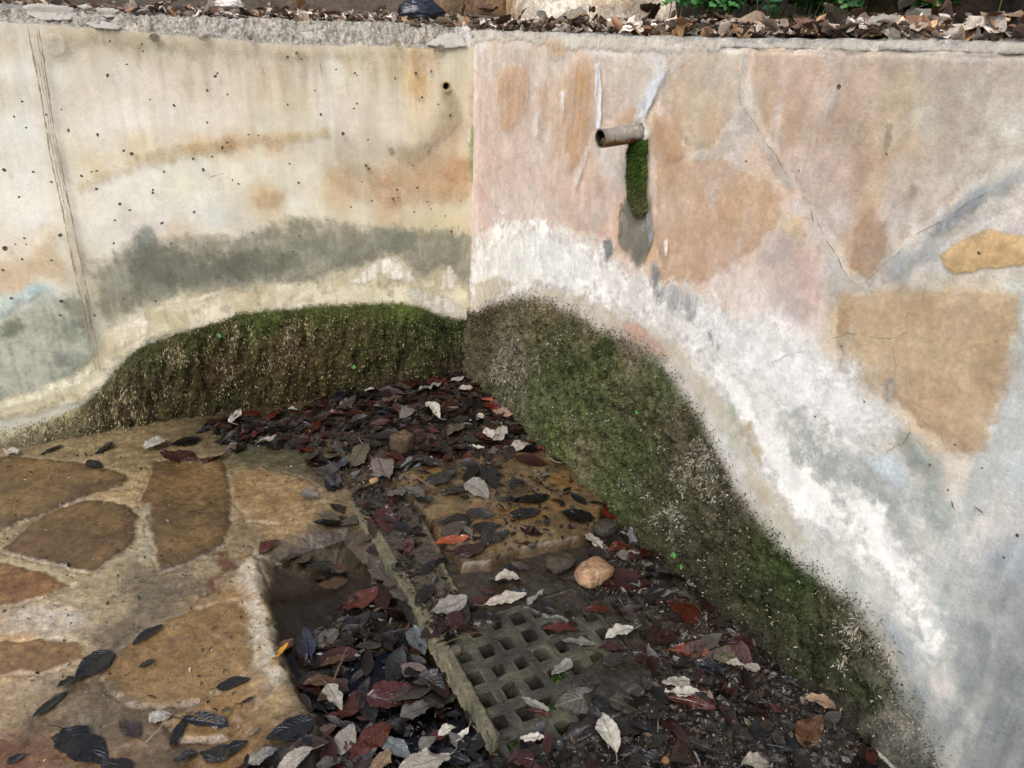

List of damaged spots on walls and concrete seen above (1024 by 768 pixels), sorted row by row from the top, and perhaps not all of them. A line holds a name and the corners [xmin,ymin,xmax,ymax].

water stain [594,63,602,129]
water stain [636,72,664,124]
water stain [925,166,1024,233]
crack [811,193,986,286]
water stain [0,196,946,707]